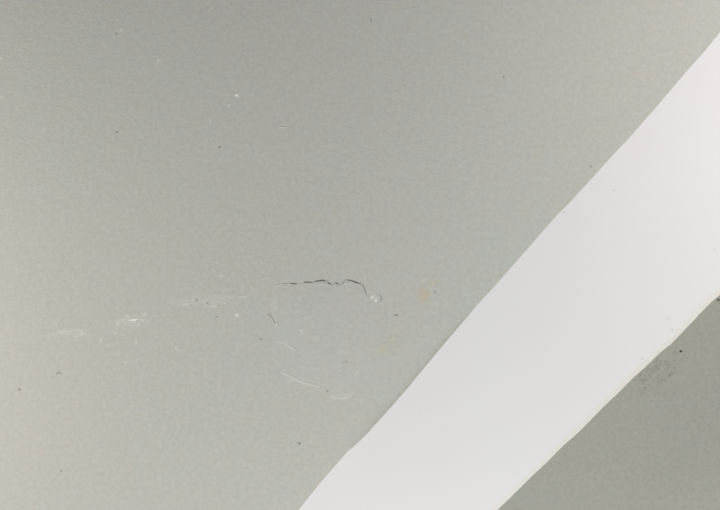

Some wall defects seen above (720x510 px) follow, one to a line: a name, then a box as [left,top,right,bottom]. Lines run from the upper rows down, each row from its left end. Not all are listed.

crack [274,270,367,299]